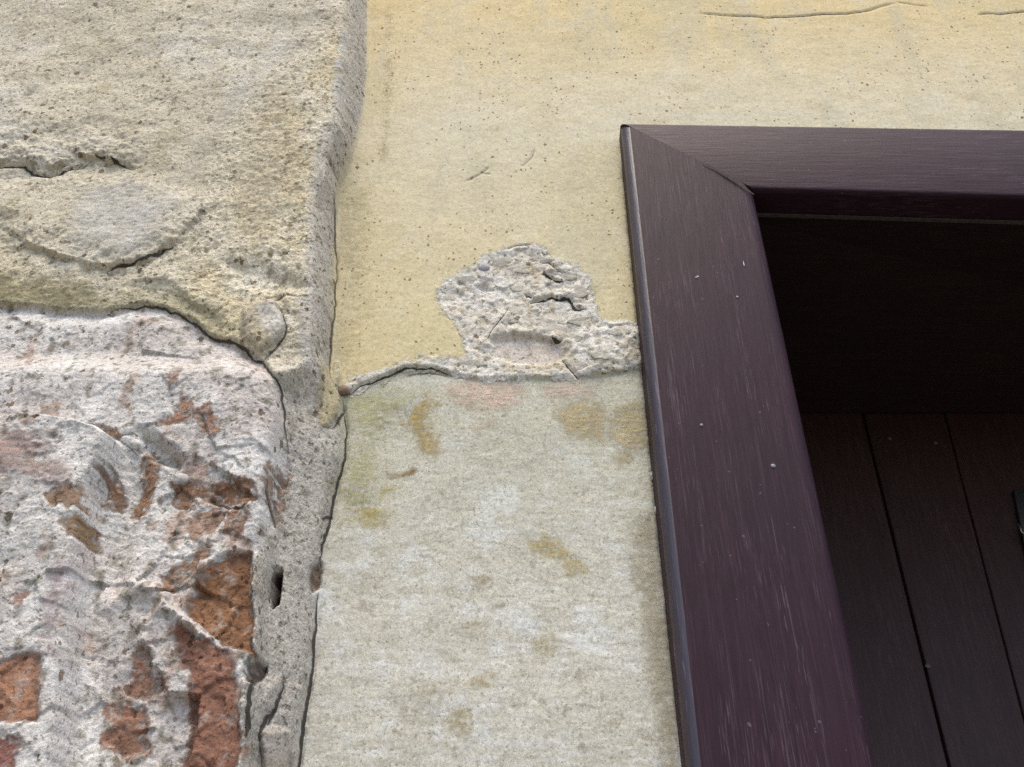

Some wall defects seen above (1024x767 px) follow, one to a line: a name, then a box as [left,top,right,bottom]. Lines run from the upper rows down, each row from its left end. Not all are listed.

crack [0,151,132,179]
peeling [159,397,221,435]
leakage [351,395,438,453]
leakage [449,379,522,409]
leakage [548,384,649,463]
peeling [44,484,102,552]
flaking render [293,242,681,767]
peeling [92,454,291,767]
peeling [0,653,43,767]